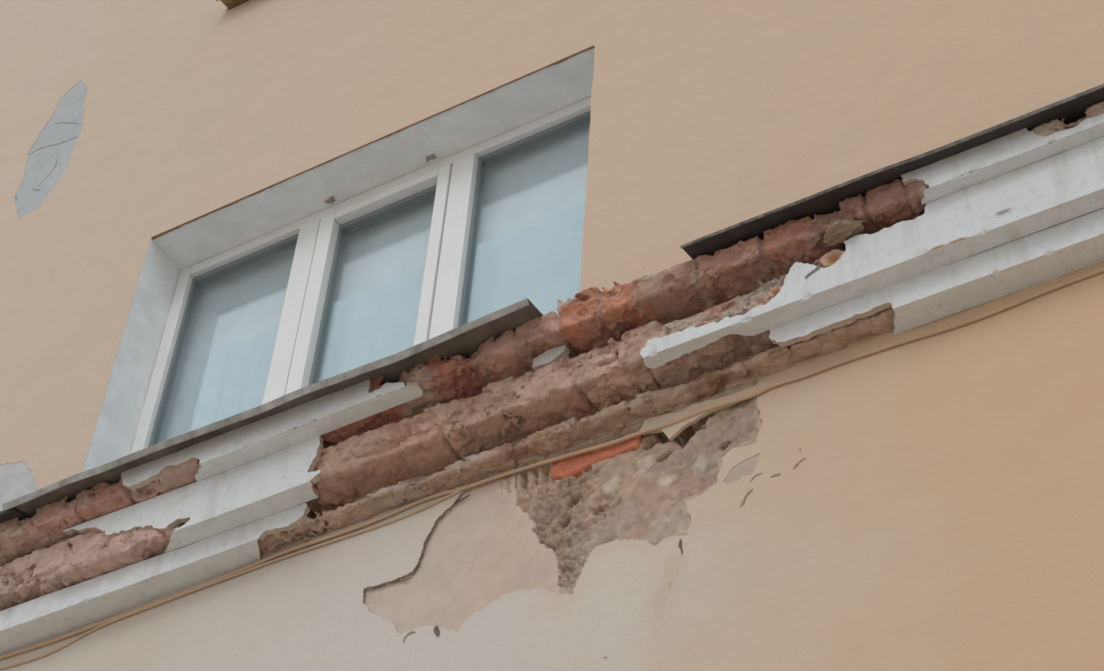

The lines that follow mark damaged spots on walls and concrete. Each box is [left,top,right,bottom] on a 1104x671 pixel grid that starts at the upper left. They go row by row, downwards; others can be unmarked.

peeling [14,80,88,219]
flaking render [0,459,228,611]
flaking render [365,379,772,636]